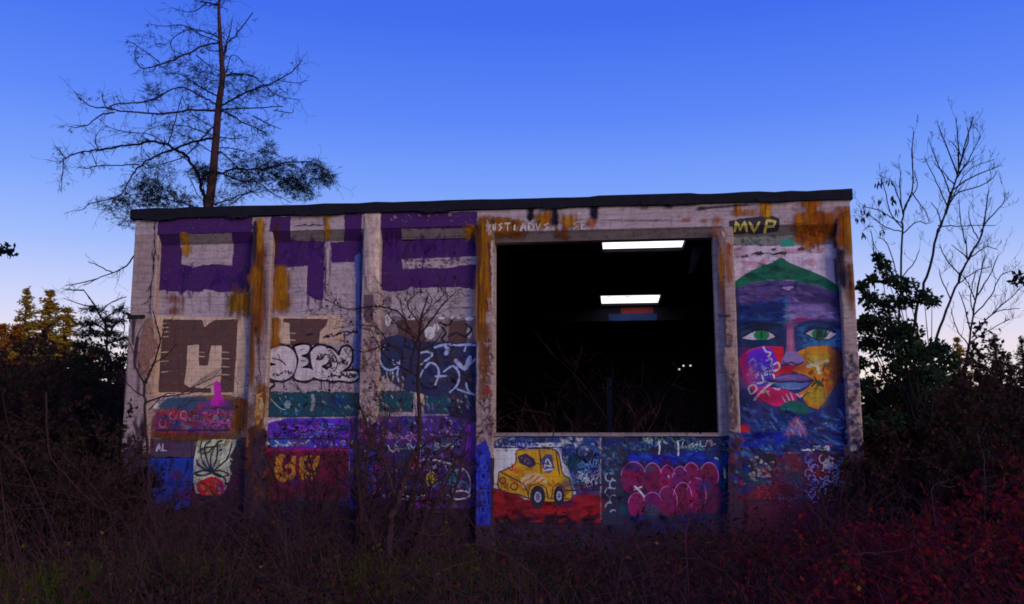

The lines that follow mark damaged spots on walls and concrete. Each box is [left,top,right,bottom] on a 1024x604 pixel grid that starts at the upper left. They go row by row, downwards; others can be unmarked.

corrosion [181,232,190,256]
corrosion [791,200,855,301]
corrosion [227,218,291,463]
corrosion [465,211,594,396]
corrosion [154,433,221,442]